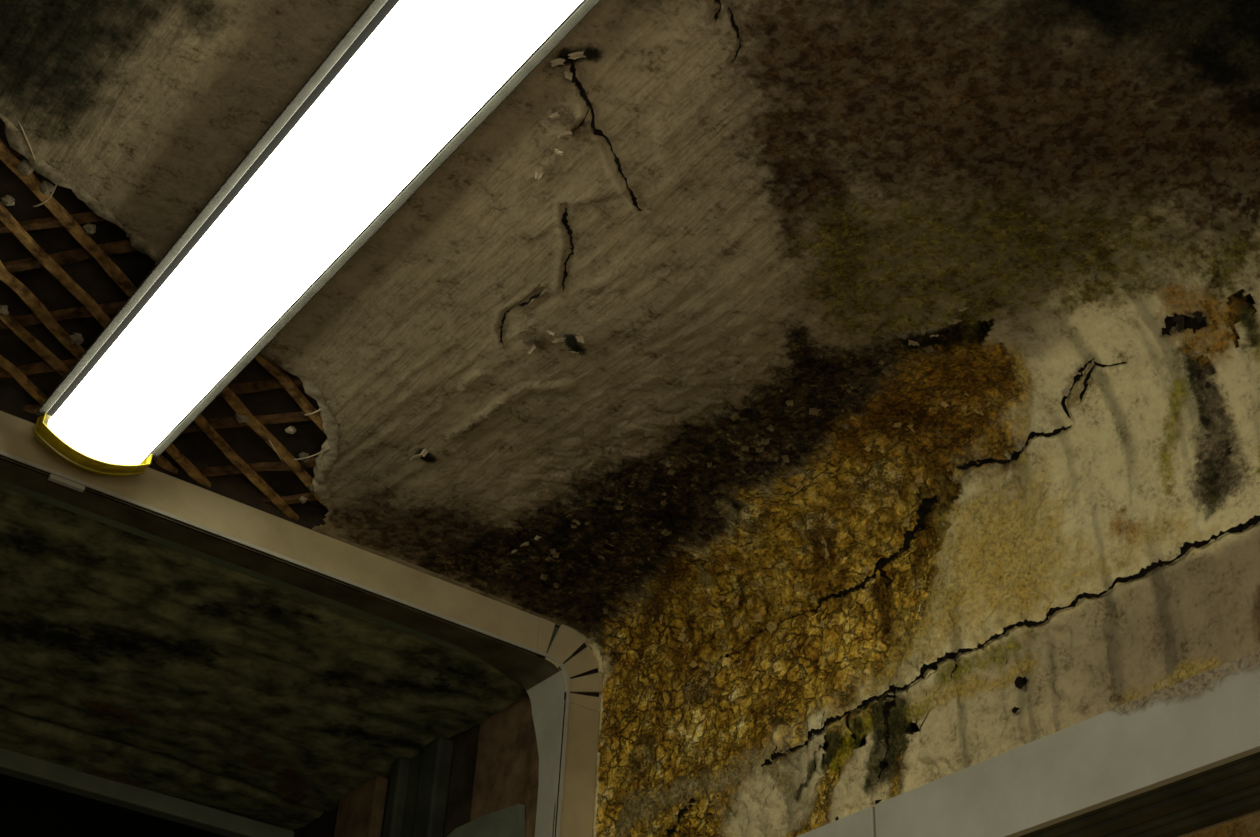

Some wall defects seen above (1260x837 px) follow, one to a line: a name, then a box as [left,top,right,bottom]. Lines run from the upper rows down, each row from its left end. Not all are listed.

damp [731,0,1260,297]
spalling [0,113,160,424]
spalling [148,348,339,529]
rust [839,351,1022,584]
crack [956,358,1126,470]
peeling [1161,311,1207,336]
damp [1177,343,1245,518]
rust [628,558,684,682]
damp [321,325,1081,837]
crack [720,495,938,660]
rust [870,577,899,648]
crack [761,515,1260,782]